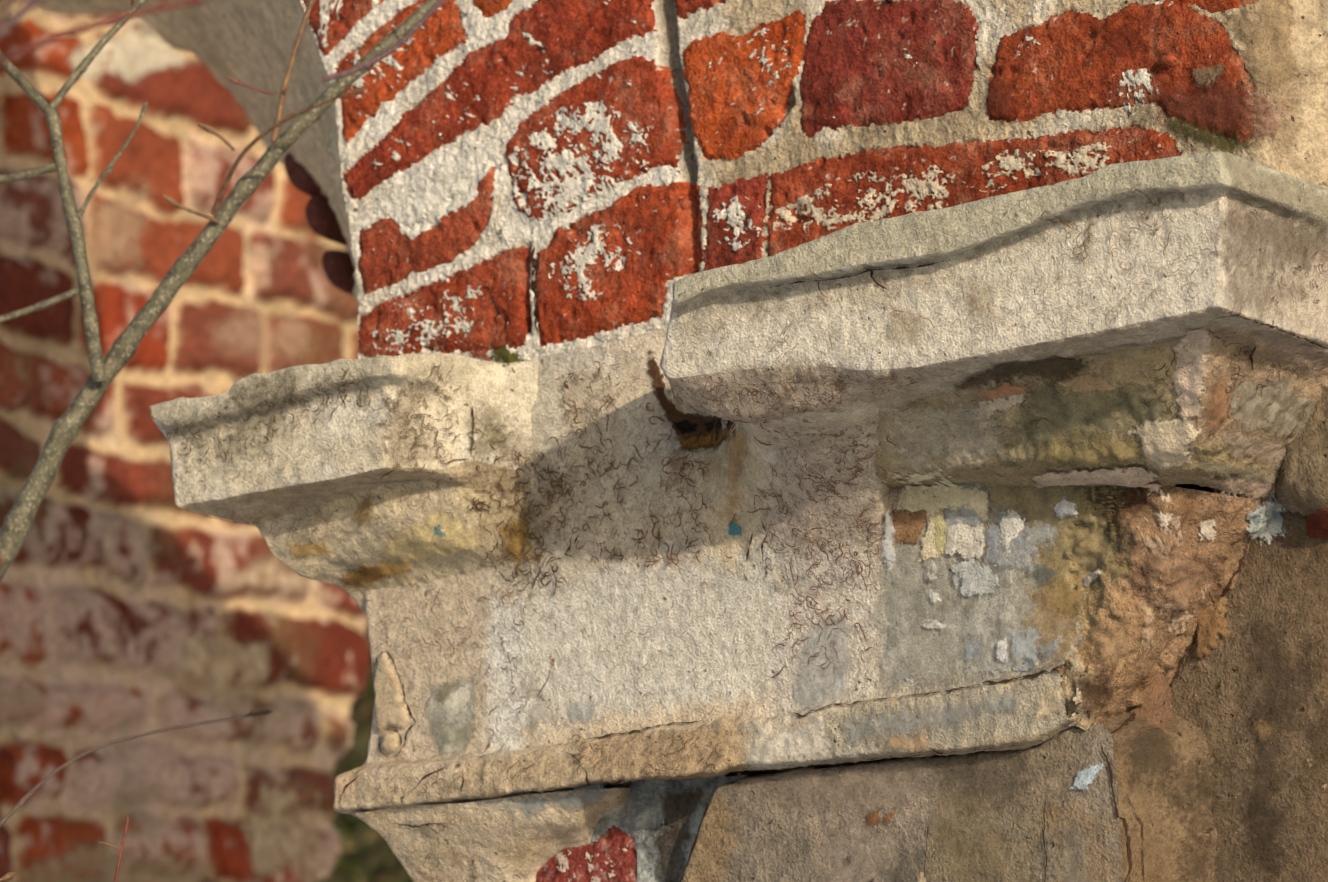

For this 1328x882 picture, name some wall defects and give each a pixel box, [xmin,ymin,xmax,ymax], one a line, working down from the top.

crack [1006,187,1328,450]
crack [156,247,1062,882]
spalling [870,329,1316,731]
damp [1085,486,1150,567]
crack [1208,537,1250,604]
peeling [743,617,1020,766]
damp [1076,669,1114,715]
crack [1169,636,1197,688]
crack [1099,712,1144,882]